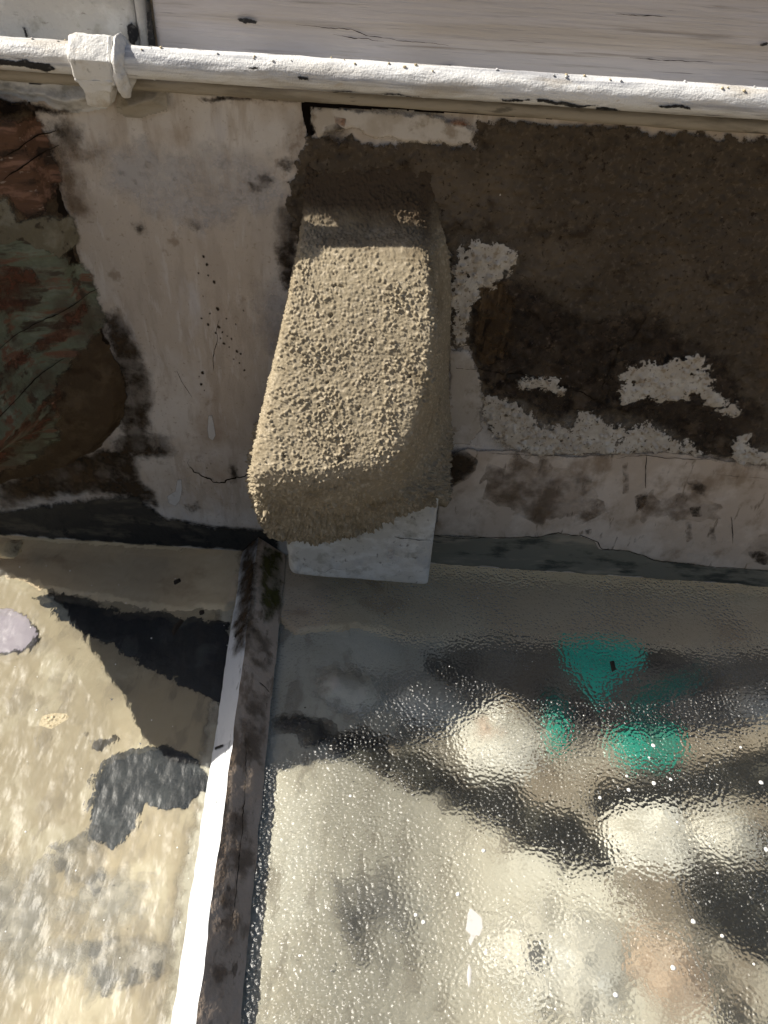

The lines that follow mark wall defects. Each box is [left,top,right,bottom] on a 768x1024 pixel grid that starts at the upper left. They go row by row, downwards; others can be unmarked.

flaking render [450,239,518,349]
peeling [0,240,106,473]
damp [0,304,170,507]
crack [190,467,248,483]
damp [449,451,477,487]
damp [487,460,560,523]
flaking render [480,376,711,457]
flaking render [616,354,742,420]
damp [673,484,704,517]
flaking render [731,432,768,467]